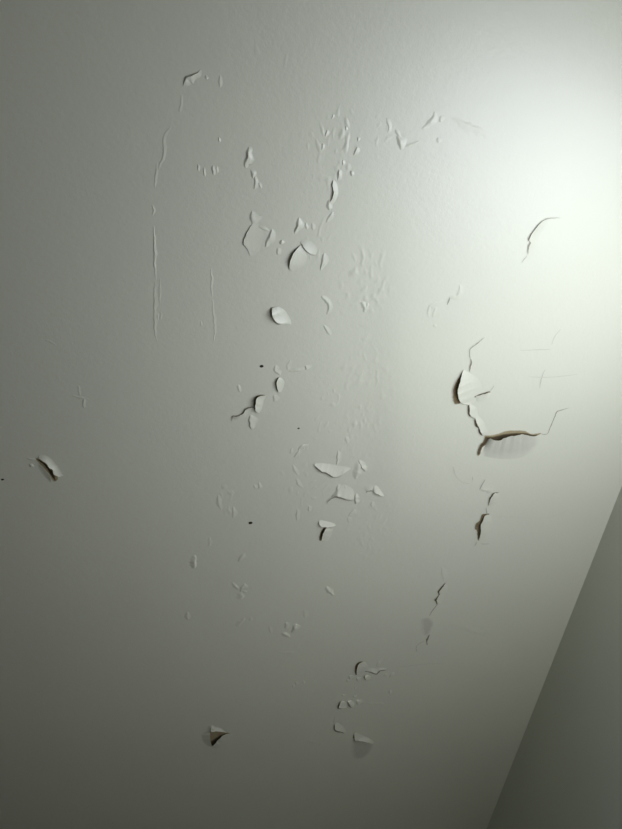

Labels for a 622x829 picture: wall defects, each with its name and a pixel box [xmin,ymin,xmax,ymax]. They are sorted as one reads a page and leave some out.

peeling [326,169,355,223]
peeling [242,211,329,271]
crack [521,218,555,263]
peeling [270,307,291,325]
peeling [231,360,312,429]
crack [452,338,568,459]
peeling [27,454,63,482]
peeling [319,520,336,541]
peeling [314,436,384,522]
crack [453,466,579,547]
crack [416,567,449,652]
peeling [201,725,232,748]